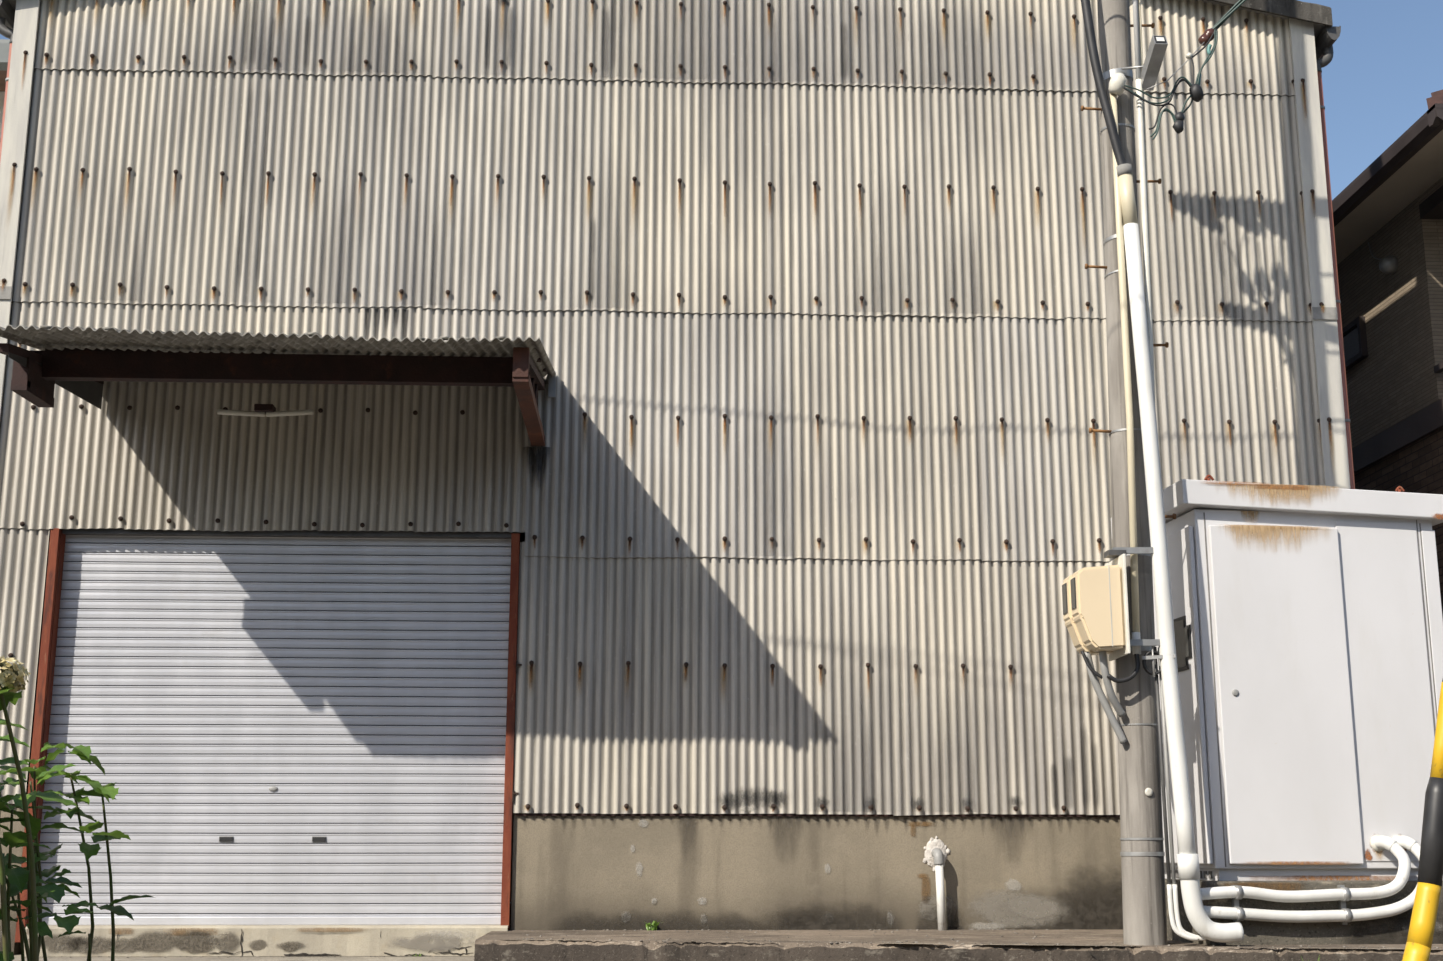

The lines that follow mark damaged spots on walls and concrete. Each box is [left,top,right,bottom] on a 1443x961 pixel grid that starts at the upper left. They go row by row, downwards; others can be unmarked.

water stain [365,308,408,339]
rust [1211,481,1334,541]
water stain [723,792,782,811]
water stain [564,910,895,930]
water stain [918,917,961,930]